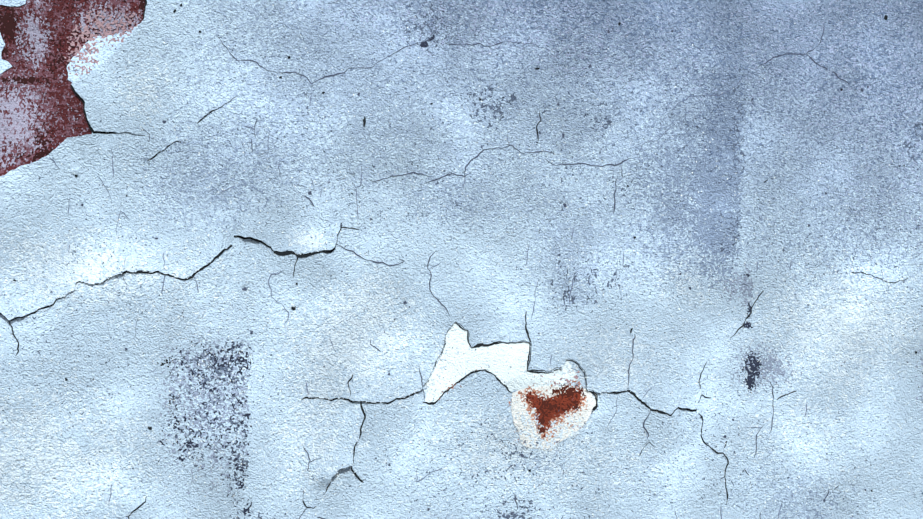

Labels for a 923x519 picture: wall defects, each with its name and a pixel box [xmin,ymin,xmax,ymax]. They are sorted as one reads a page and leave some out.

spalling [0,0,145,176]
crack [0,25,849,355]
rust [507,380,588,444]
crack [299,243,807,519]